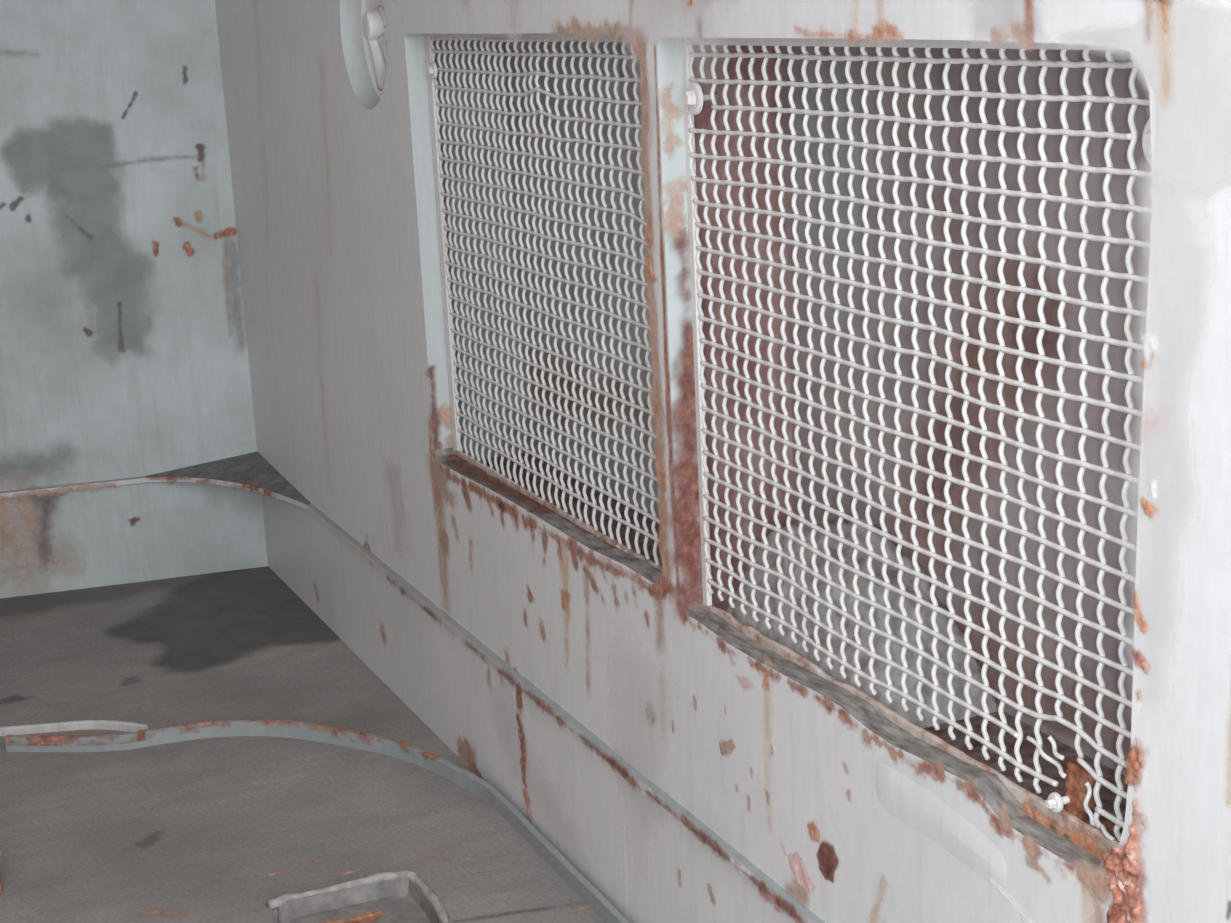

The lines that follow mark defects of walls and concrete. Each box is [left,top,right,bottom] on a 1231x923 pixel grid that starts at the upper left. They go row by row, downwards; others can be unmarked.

rust [848,7,901,41]
rust [992,0,1033,47]
rust [1145,0,1169,97]
leakage [2,121,151,354]
rust [428,18,709,658]
leakage [112,566,340,669]
rust [749,659,903,761]
rust [914,762,1040,860]
rust [1065,743,1145,923]
rust [322,911,384,923]